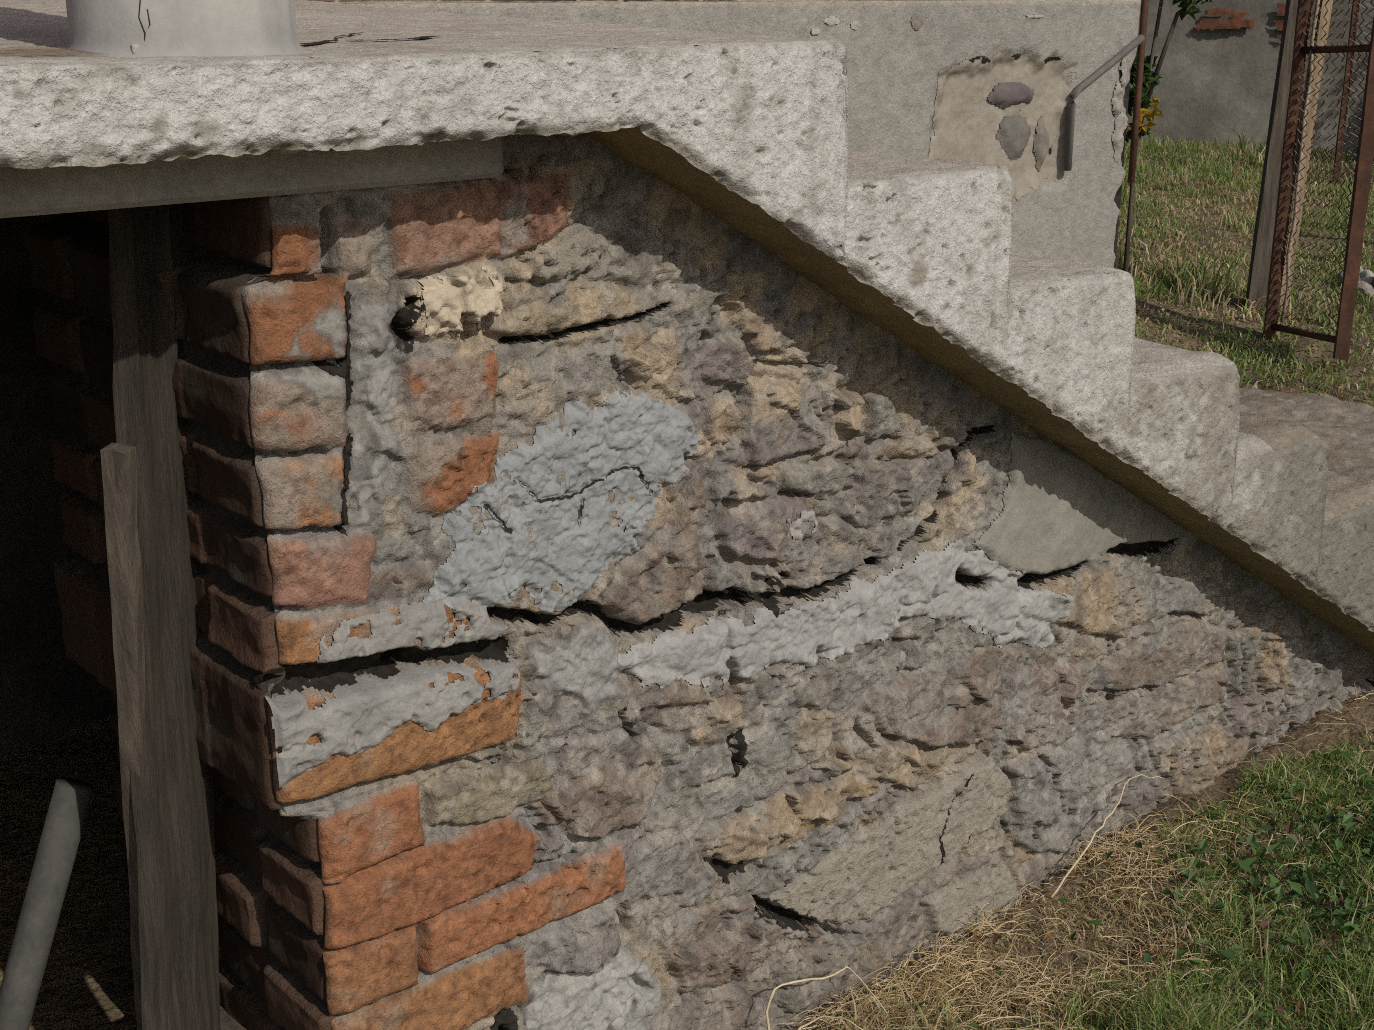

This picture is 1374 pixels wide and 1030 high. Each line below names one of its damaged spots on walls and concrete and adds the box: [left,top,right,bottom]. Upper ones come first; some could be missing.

spalling [389,267,504,354]
crack [253,425,995,695]
spalling [490,1007,519,1030]